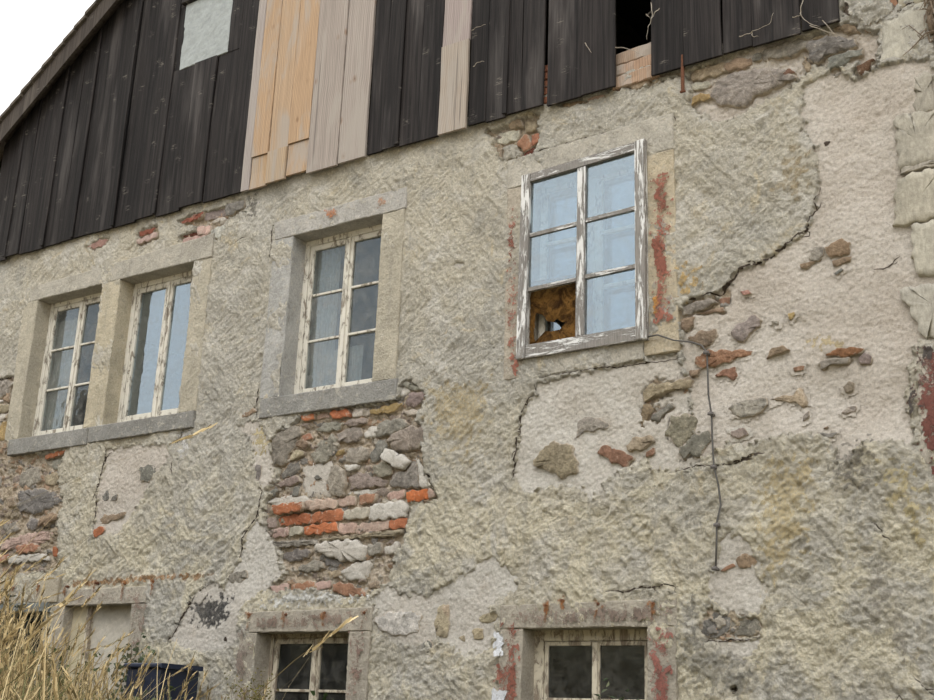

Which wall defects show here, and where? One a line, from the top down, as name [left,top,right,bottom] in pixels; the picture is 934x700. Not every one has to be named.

spalling [86,237,109,251]
spalling [136,227,159,246]
spalling [180,200,247,243]
peeling [513,2,934,501]
crack [684,187,821,305]
spalling [0,376,65,577]
crack [92,448,110,526]
crack [239,487,262,558]
spalling [170,381,673,700]
leakage [187,592,235,629]